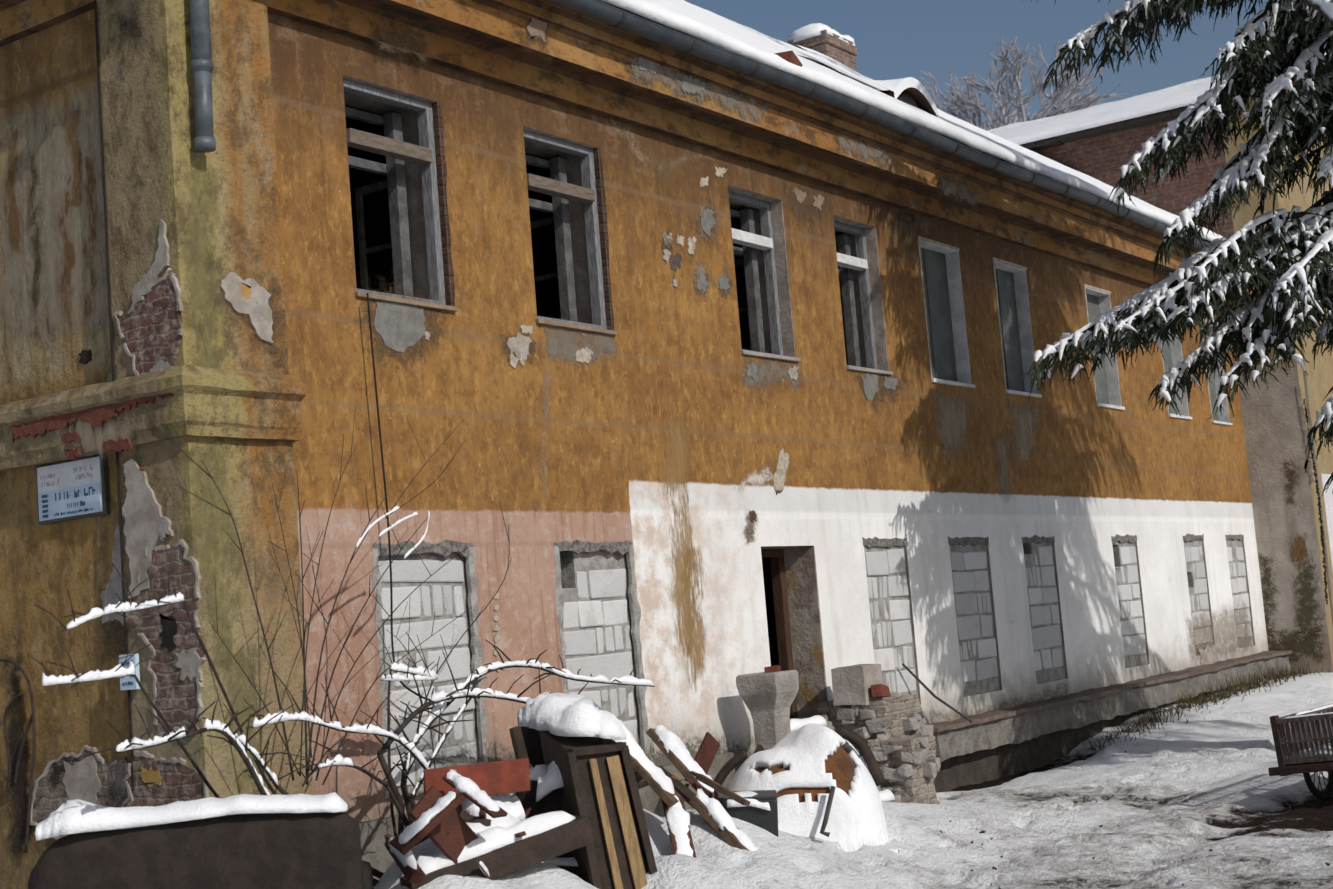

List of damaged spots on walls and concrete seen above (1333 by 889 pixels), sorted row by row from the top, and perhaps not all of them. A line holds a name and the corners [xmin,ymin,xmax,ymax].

peeling [699,166,728,187]
water stain [1,93,109,352]
peeling [114,219,184,376]
peeling [214,266,286,364]
peeling [503,324,616,369]
peeling [661,232,697,287]
peeling [740,448,789,495]
spalling [11,392,206,738]
spalling [30,745,210,825]